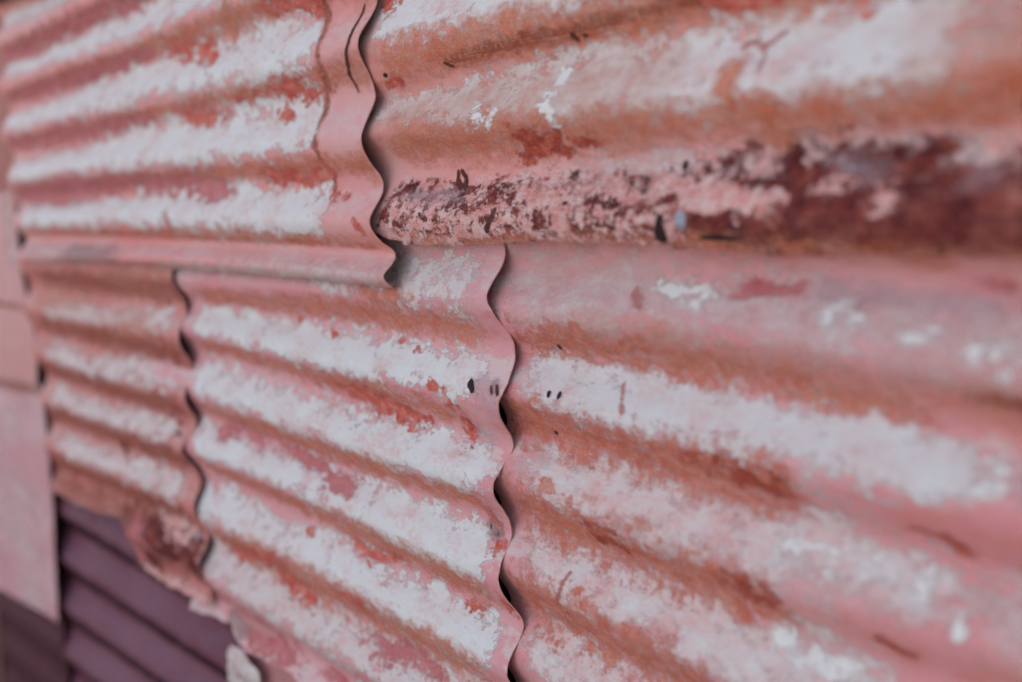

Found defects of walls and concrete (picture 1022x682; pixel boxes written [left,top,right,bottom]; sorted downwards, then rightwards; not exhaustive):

peeling [1,0,352,267]
rust [379,0,738,75]
peeling [369,0,1011,186]
rust [376,63,1022,259]
peeling [44,297,175,337]
rust [40,360,185,420]
peeling [43,336,191,509]
rust [45,405,193,475]
rust [46,449,493,673]
peeling [160,245,531,682]
rust [210,408,482,507]
peeling [518,342,1016,682]